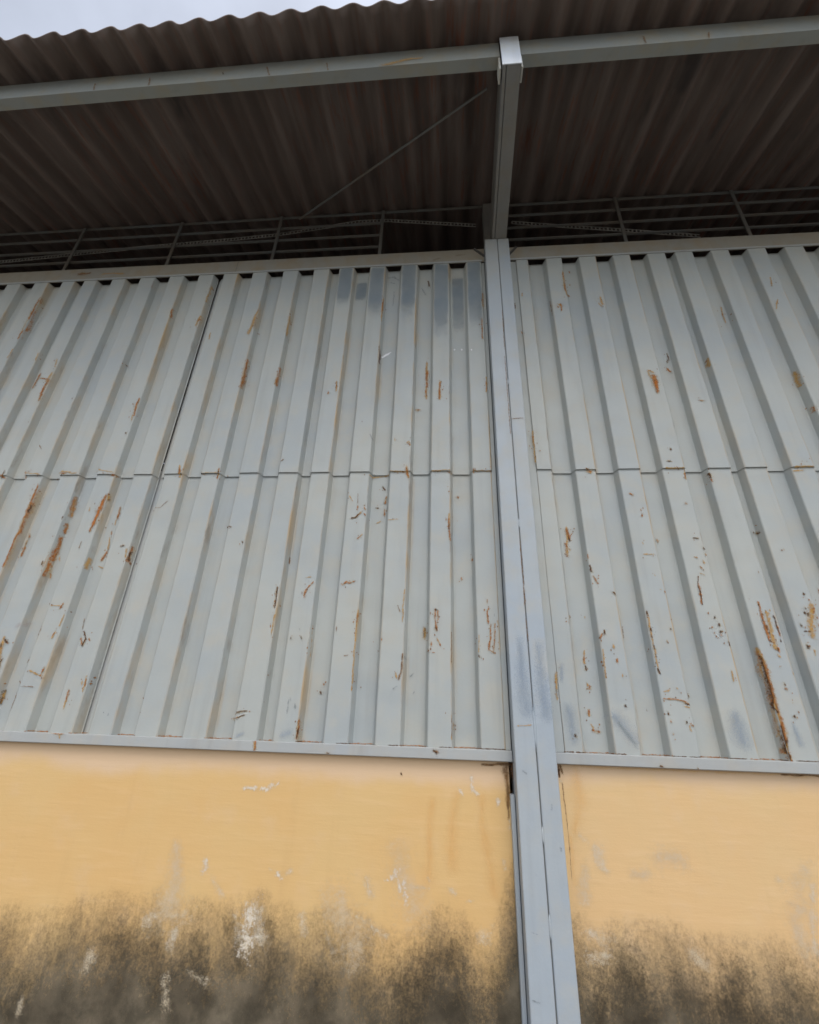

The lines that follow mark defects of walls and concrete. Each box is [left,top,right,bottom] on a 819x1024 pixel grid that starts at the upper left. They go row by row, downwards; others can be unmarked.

rust [646,354,671,394]
rust [3,471,42,567]
rust [39,493,137,579]
rust [422,608,452,663]
rust [800,590,819,656]
rust [643,602,819,769]
damp [0,790,522,1024]
damp [575,924,819,1024]